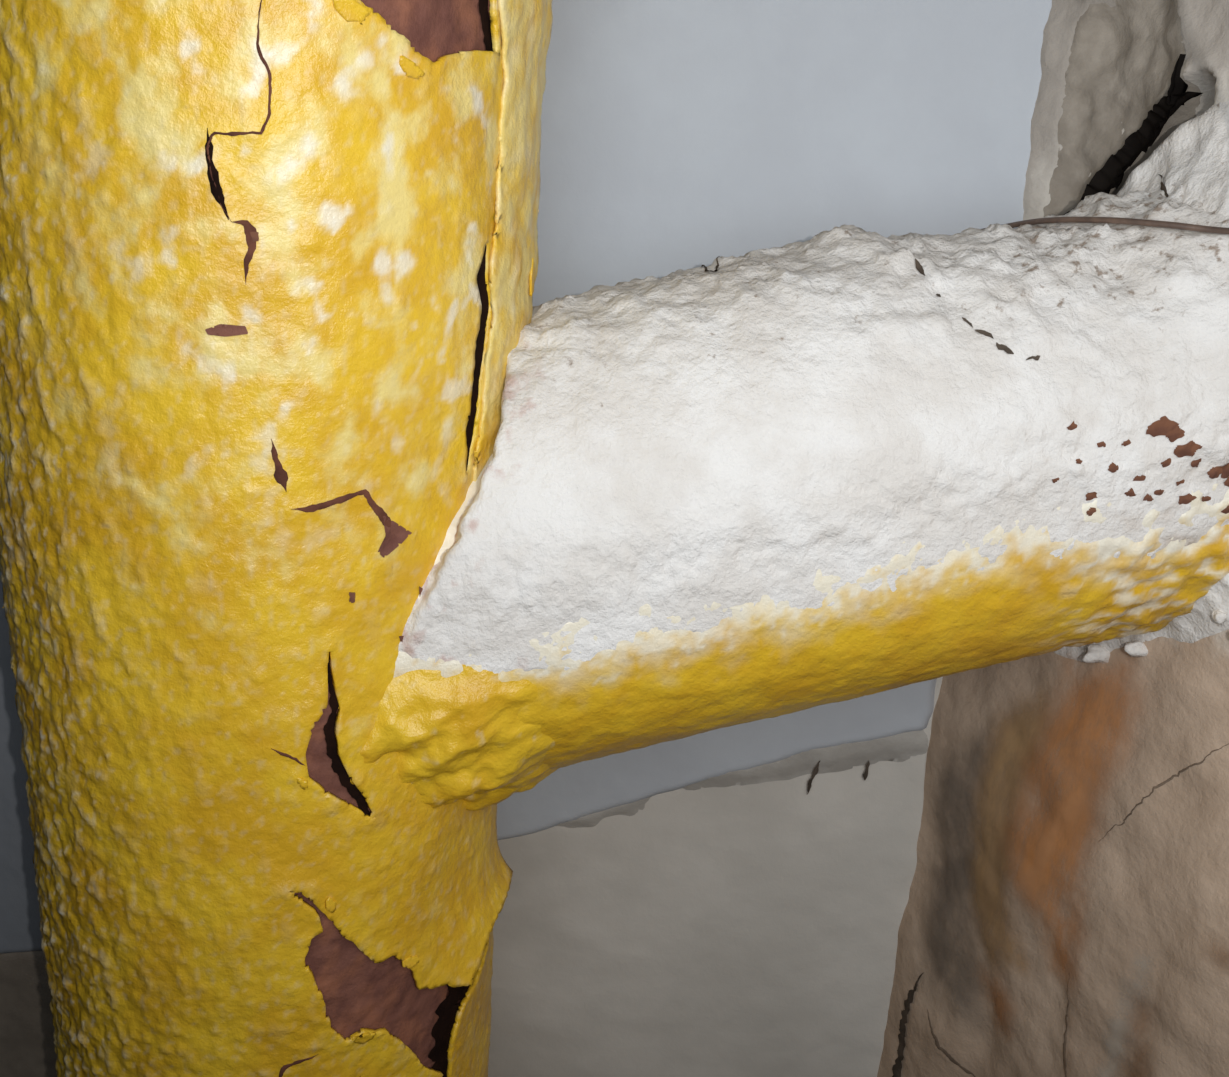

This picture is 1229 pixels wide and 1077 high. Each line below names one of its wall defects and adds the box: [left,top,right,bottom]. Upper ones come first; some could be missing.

crack [205,0,272,282]
crack [1064,54,1202,215]
peeling [333,0,553,482]
peeling [205,324,248,337]
crack [466,245,489,471]
crack [271,439,412,558]
peeling [272,661,371,815]
peeling [294,892,448,1068]
crack [892,972,976,1077]